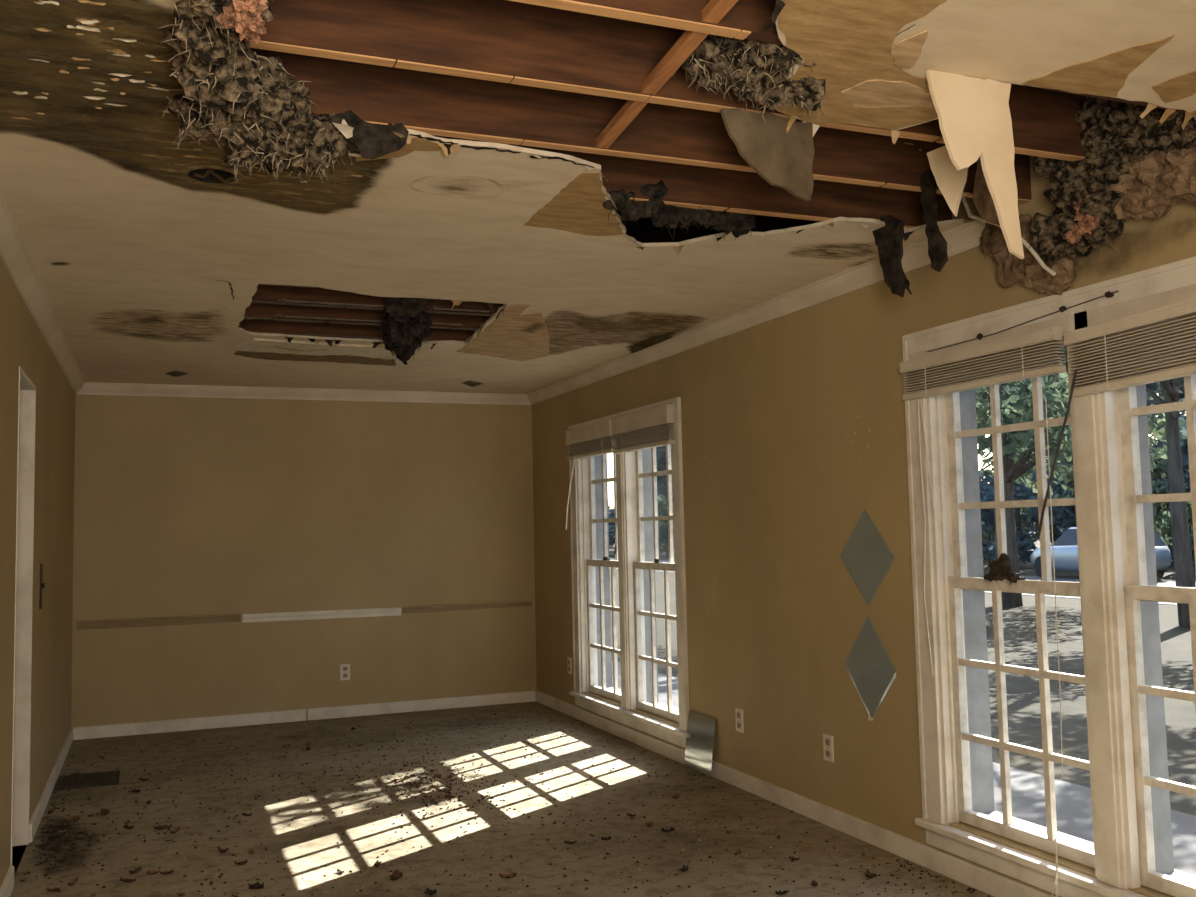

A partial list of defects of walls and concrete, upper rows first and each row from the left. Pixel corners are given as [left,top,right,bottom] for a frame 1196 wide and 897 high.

spalling [761,0,785,34]
water stain [0,0,390,214]
spalling [332,122,354,139]
spalling [786,116,820,136]
spalling [1140,103,1193,130]
spalling [393,132,608,181]